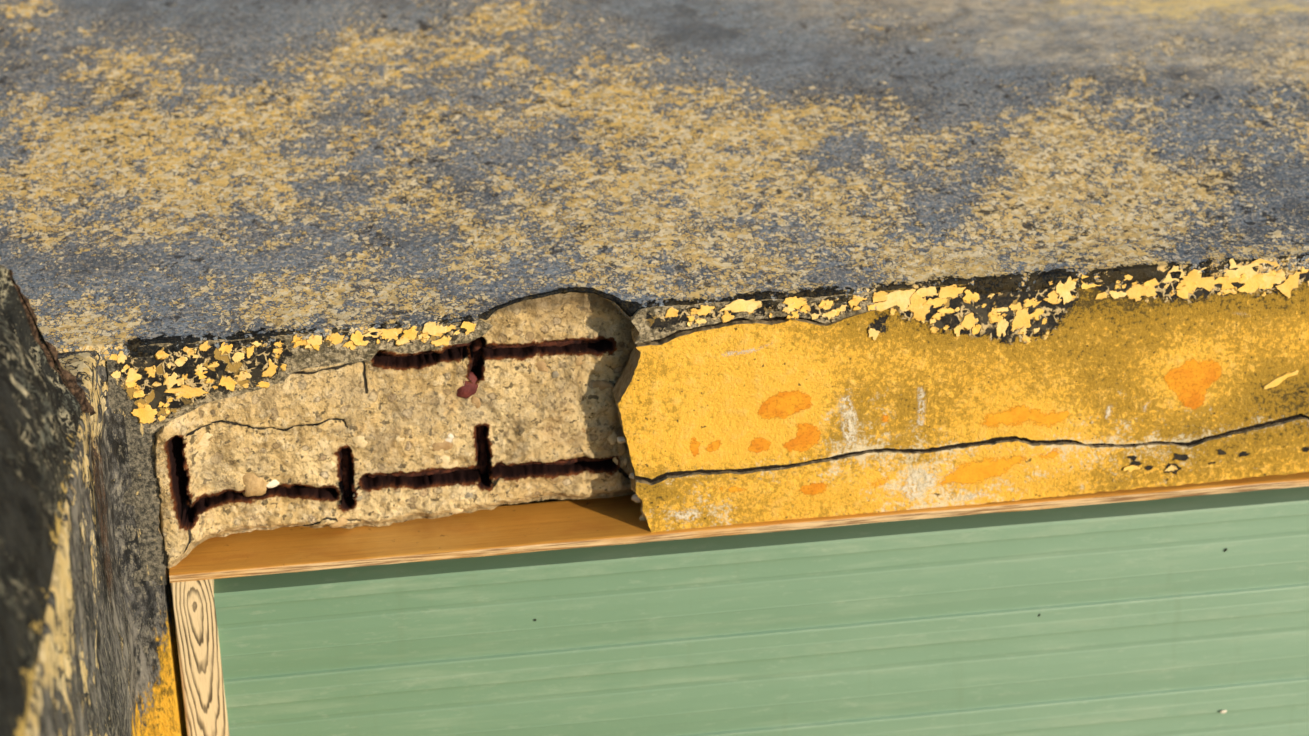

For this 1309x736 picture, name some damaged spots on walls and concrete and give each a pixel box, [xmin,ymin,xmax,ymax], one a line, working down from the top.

crack [293,361,369,394]
corrosion [371,336,617,384]
crack [186,418,348,437]
corrosion [164,423,621,531]
spalling [155,292,646,572]
crack [618,413,1309,483]